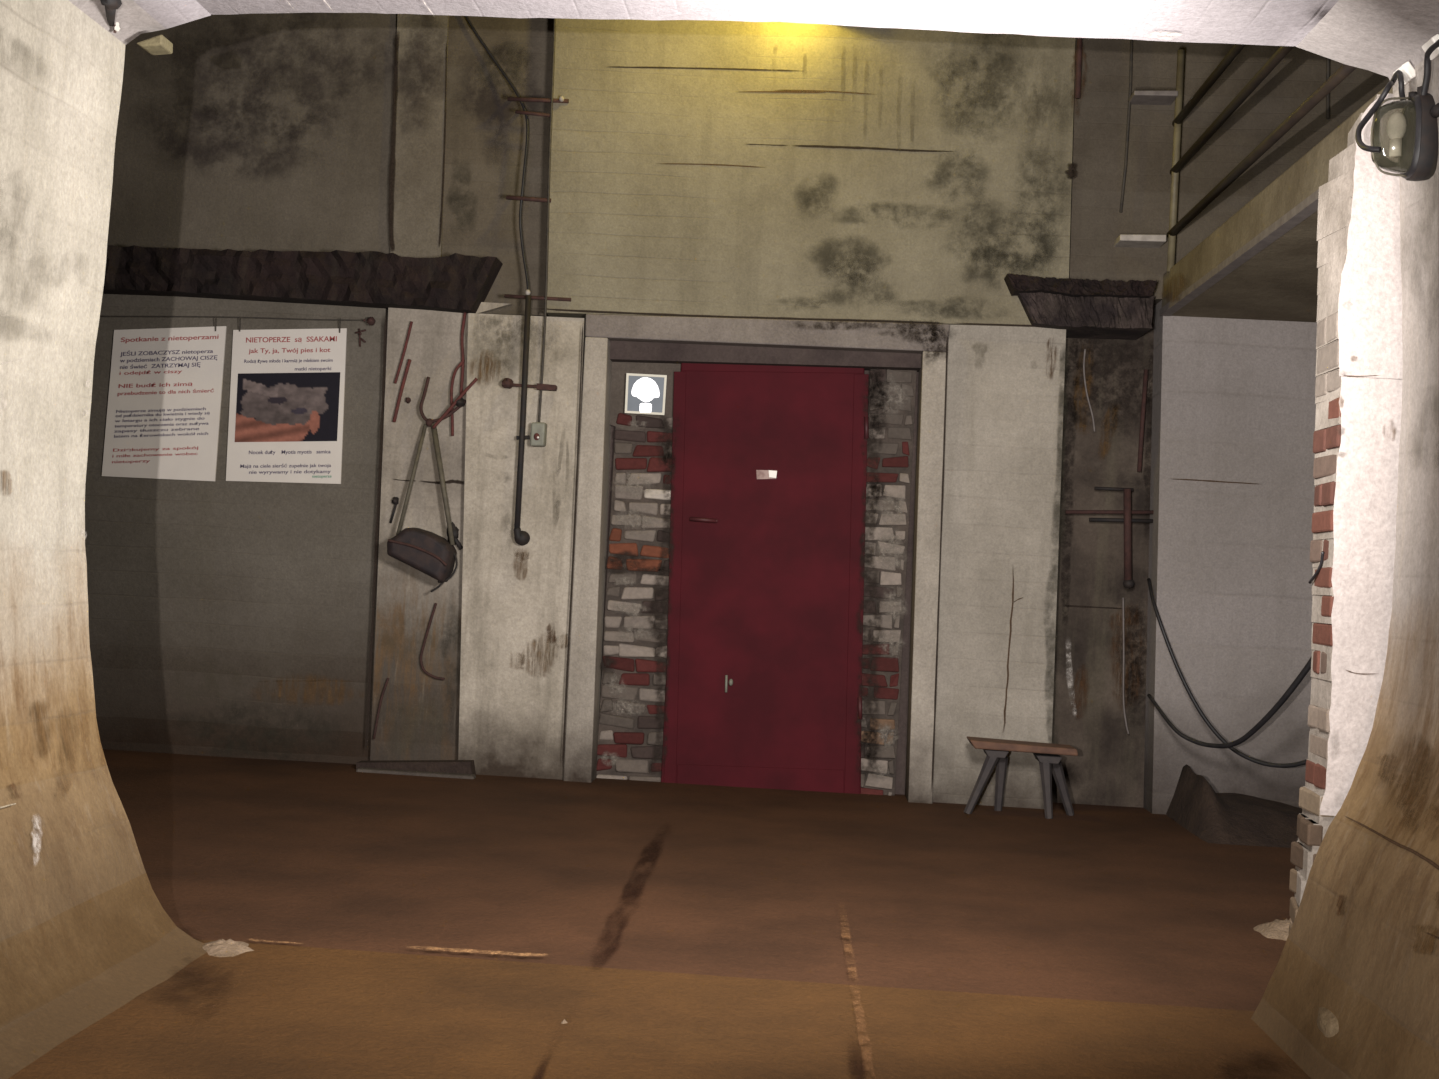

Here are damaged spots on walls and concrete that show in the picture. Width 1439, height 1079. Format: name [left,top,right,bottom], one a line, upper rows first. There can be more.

flaking render [1310,311,1343,674]
flaking render [1289,705,1334,933]
crack [1347,817,1439,870]